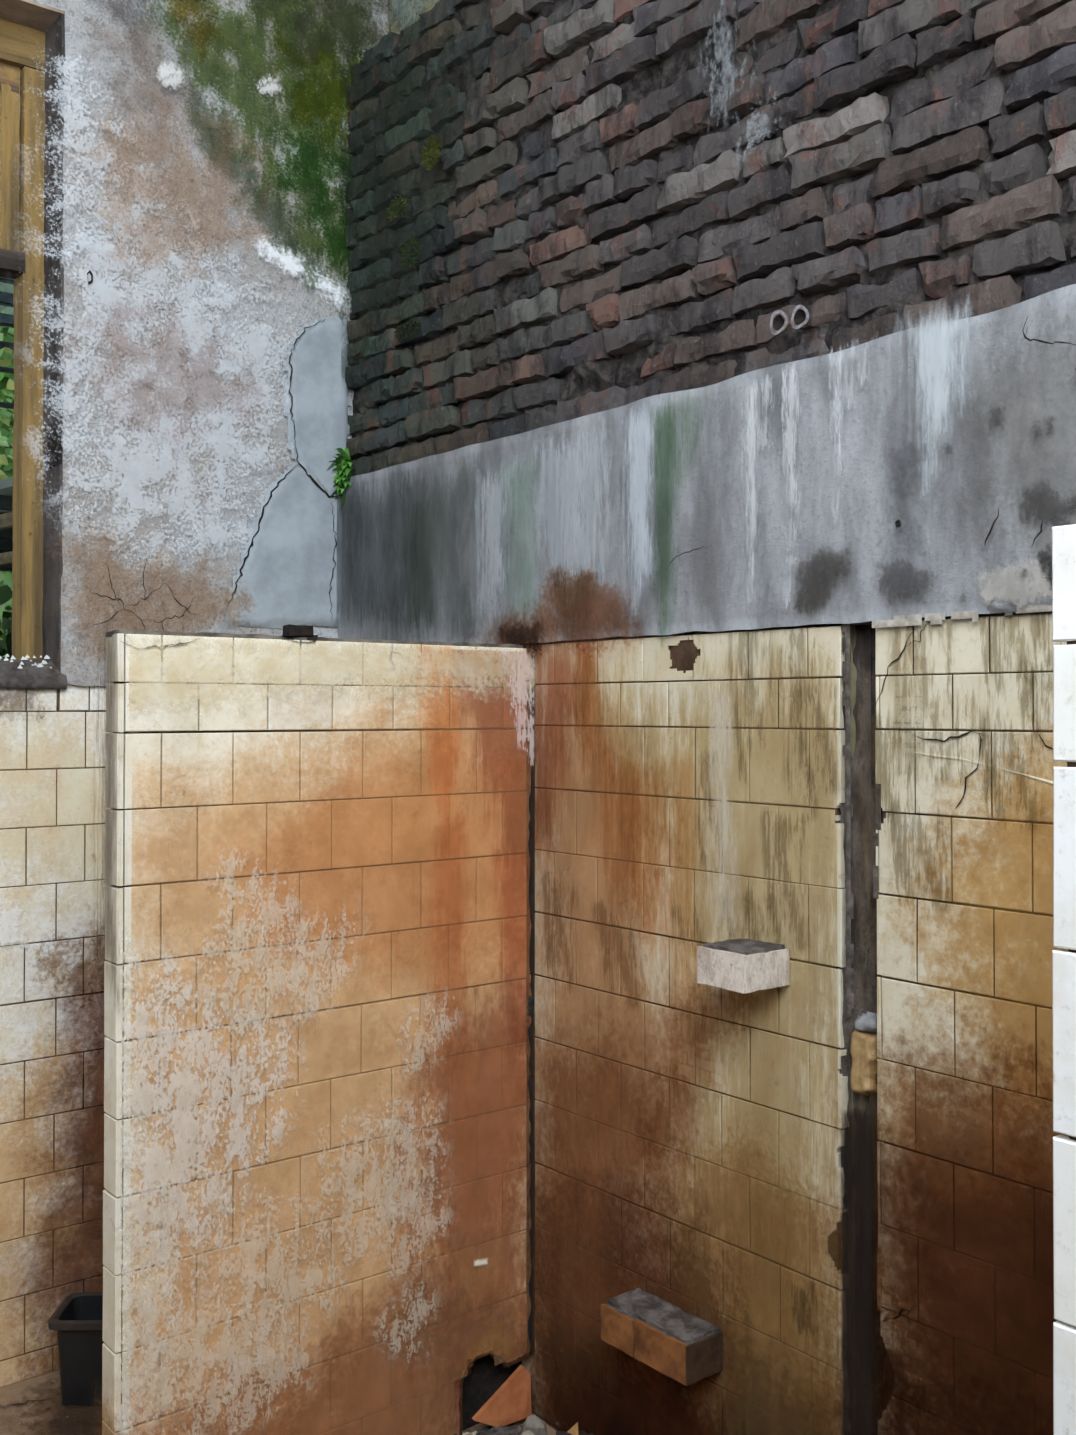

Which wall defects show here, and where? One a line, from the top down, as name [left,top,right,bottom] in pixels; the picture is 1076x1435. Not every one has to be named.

water stain [151,0,369,309]
crack [89,320,342,650]
corrosion [500,622,539,651]
water stain [625,411,654,609]
water stain [744,368,800,576]
crack [874,622,927,711]
efflorescence [915,313,965,489]
water stain [979,552,1052,606]
crack [911,731,985,809]
spalling [459,1350,532,1435]
corrosion [529,1182,832,1435]
corrosion [886,1075,1057,1435]